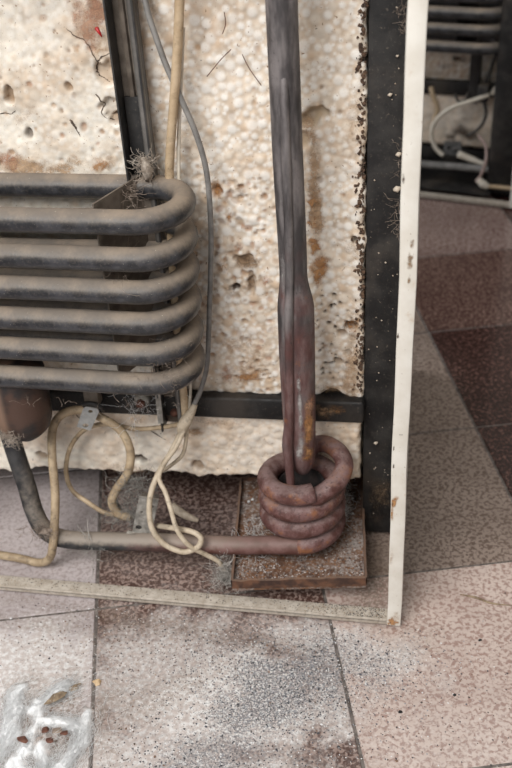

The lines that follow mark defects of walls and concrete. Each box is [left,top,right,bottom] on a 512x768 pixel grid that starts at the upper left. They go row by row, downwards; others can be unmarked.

corrosion [73,0,106,51]
corrosion [307,153,328,284]